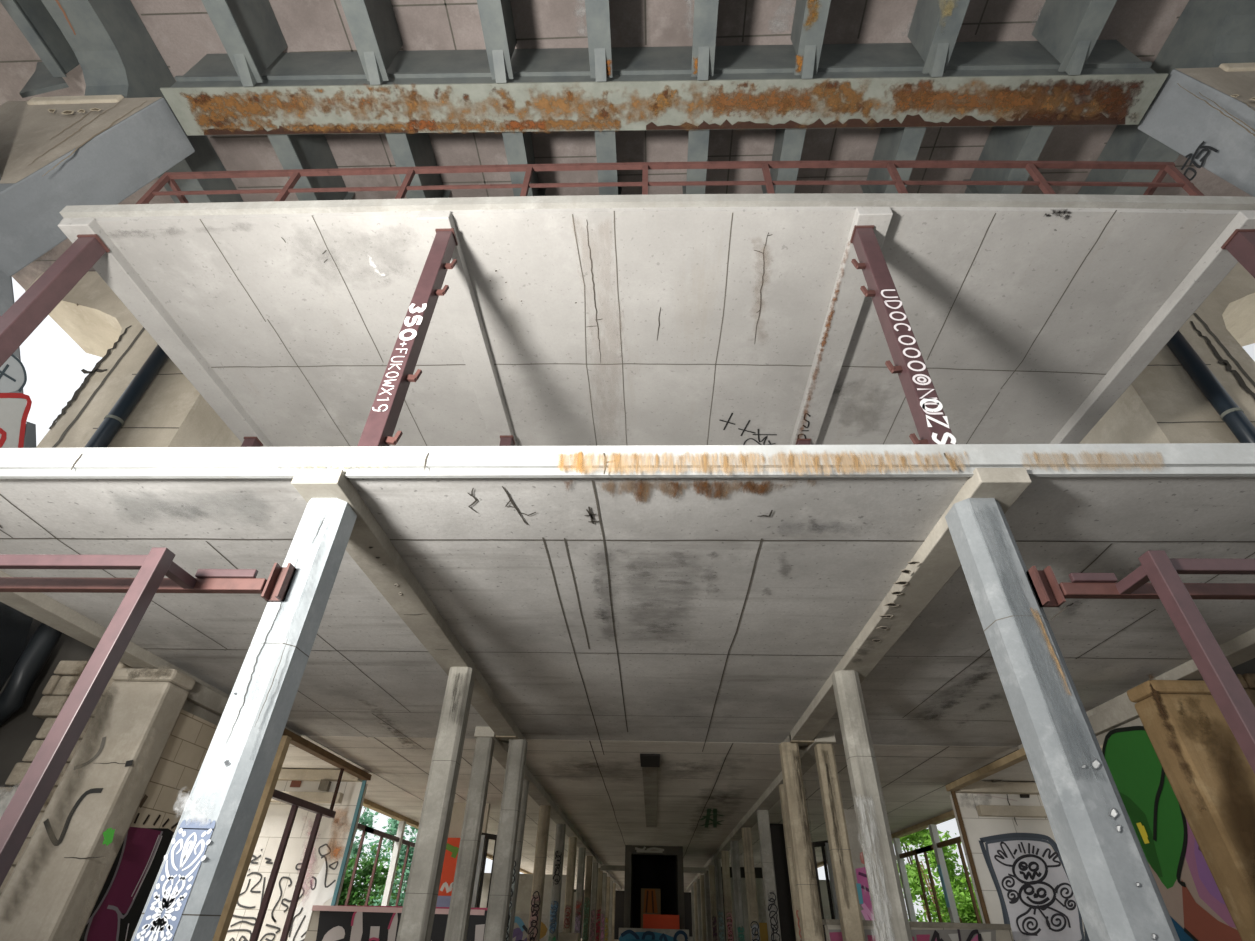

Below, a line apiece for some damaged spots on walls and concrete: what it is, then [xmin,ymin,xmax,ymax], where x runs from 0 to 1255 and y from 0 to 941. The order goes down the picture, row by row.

rust [184,80,1143,135]
crack [754,232,773,344]
rust [813,253,847,380]
rust [559,453,964,501]
crack [468,486,536,525]